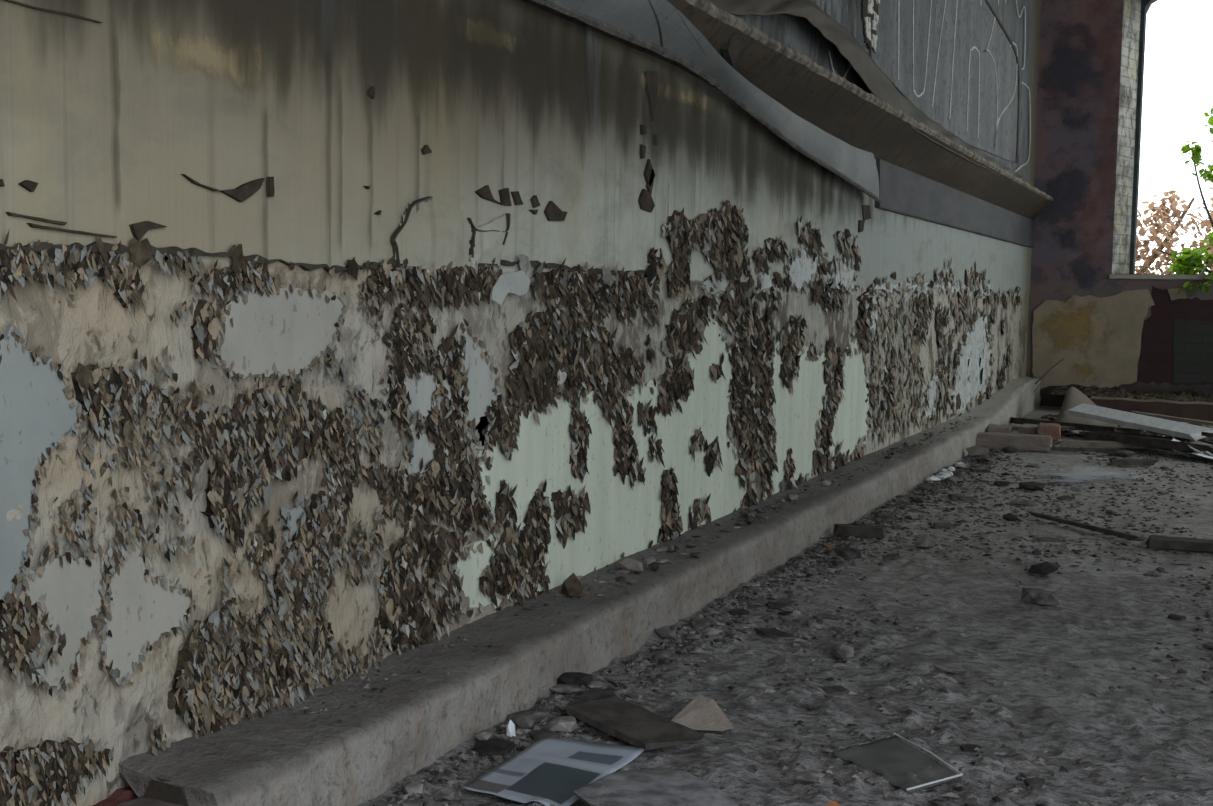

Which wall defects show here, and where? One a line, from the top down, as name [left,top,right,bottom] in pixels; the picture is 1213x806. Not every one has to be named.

spalling [860,0,880,54]
peeling [181,174,275,202]
peeling [475,185,567,221]
peeling [0,200,1213,739]
peeling [149,721,176,756]
peeling [0,734,189,806]